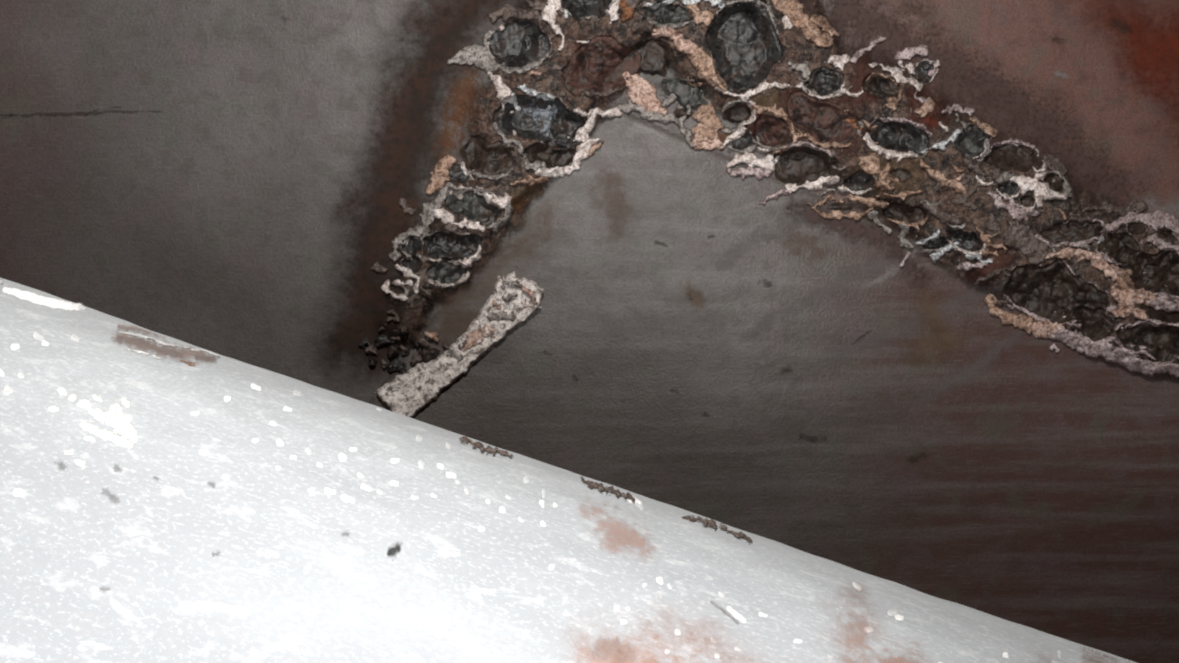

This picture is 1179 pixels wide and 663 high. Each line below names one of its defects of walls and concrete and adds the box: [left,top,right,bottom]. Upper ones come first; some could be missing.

corrosion [327,0,1179,378]